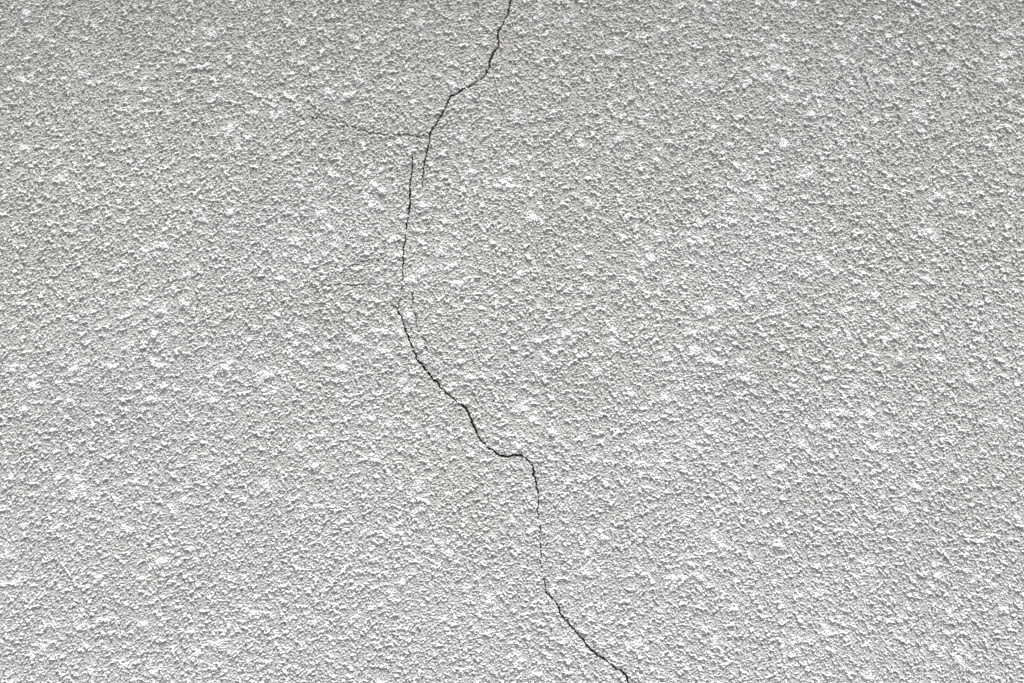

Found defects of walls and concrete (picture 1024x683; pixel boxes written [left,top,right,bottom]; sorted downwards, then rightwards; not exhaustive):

crack [297,0,629,683]